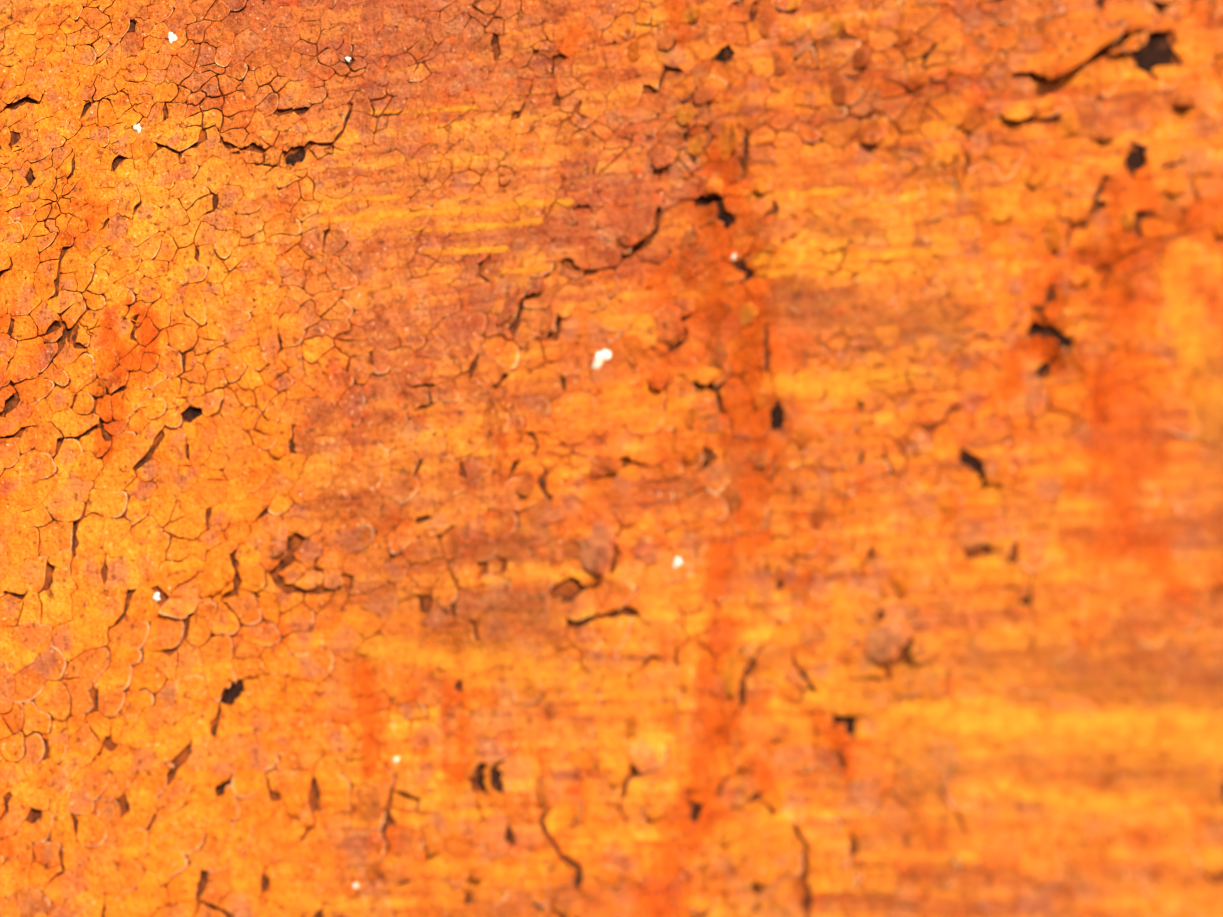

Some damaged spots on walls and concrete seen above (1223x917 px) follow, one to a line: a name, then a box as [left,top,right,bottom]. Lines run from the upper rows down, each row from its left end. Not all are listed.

spalling [715,45,734,63]
peeling [609,118,780,259]
peeling [30,229,87,373]
corrosion [99,300,158,458]
crack [0,0,863,917]
peeling [591,298,730,472]
crack [221,0,1223,673]
peeling [0,521,79,600]
peeling [143,541,244,655]
crack [789,207,1223,917]
spalling [475,763,504,793]
corrosion [641,697,772,917]